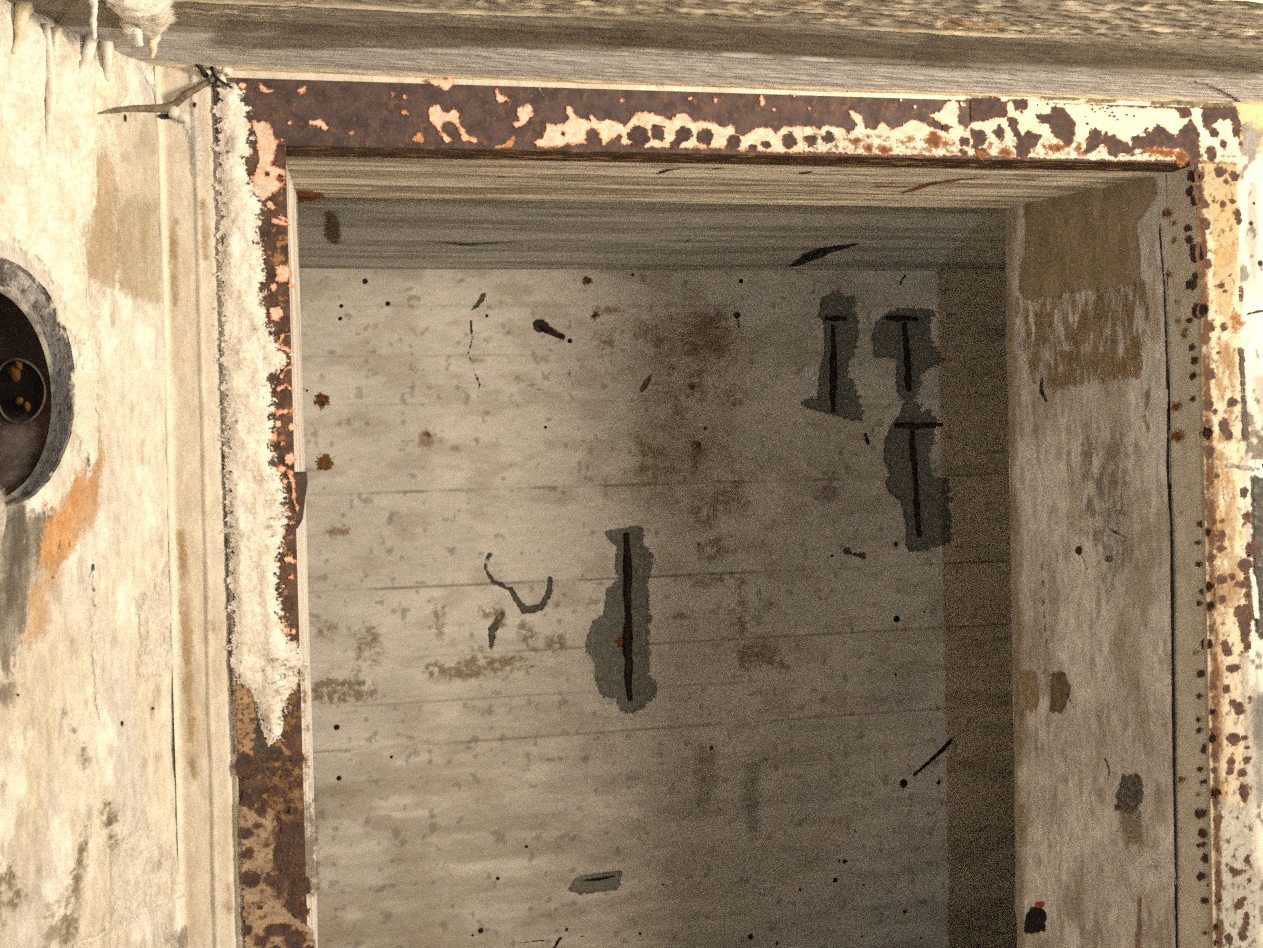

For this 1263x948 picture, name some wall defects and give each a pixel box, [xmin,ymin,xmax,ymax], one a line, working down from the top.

leakage [104,0,179,40]
peeling [534,97,1242,164]
rust [7,361,23,382]
leakage [0,505,49,704]
rust [25,430,104,642]
leakage [0,0,155,494]
leakage [158,66,307,775]
spalling [584,525,659,713]
spalling [801,290,954,552]
rust [803,96,1262,948]
peeling [1015,176,1157,432]
rust [228,750,315,948]